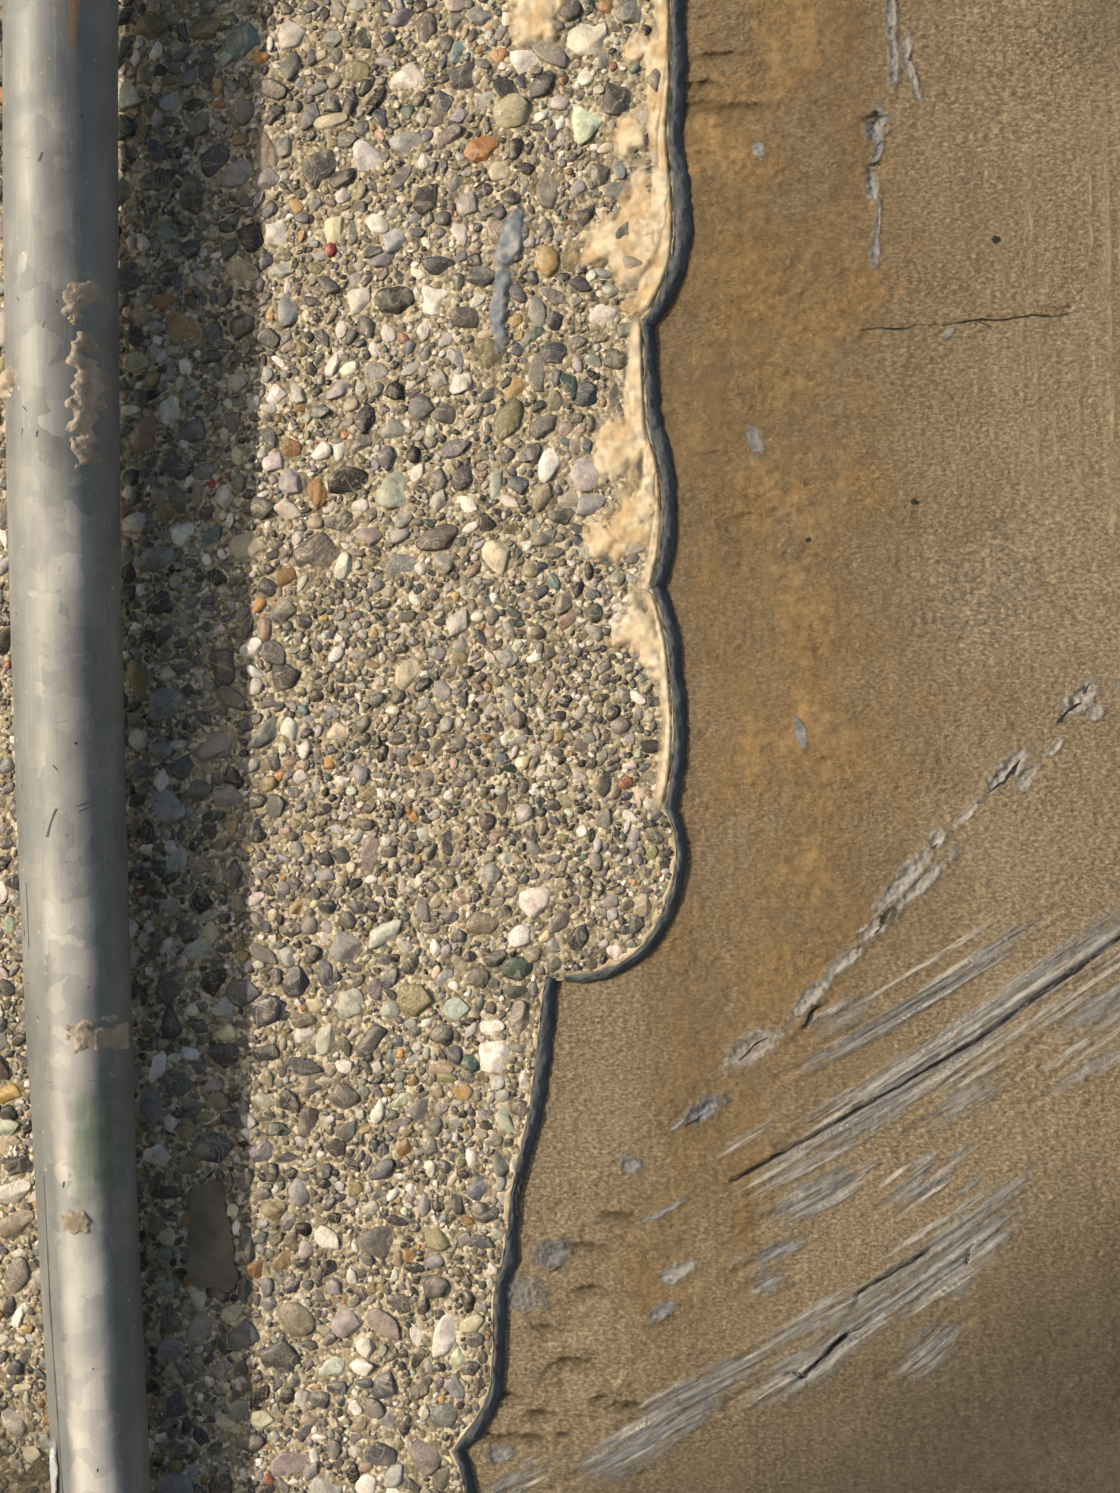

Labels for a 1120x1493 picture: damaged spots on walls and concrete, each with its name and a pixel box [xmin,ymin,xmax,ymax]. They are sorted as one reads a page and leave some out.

peeling [884,0,922,100]
peeling [864,106,889,268]
crack [733,936,1120,1182]
crack [789,1250,929,1386]